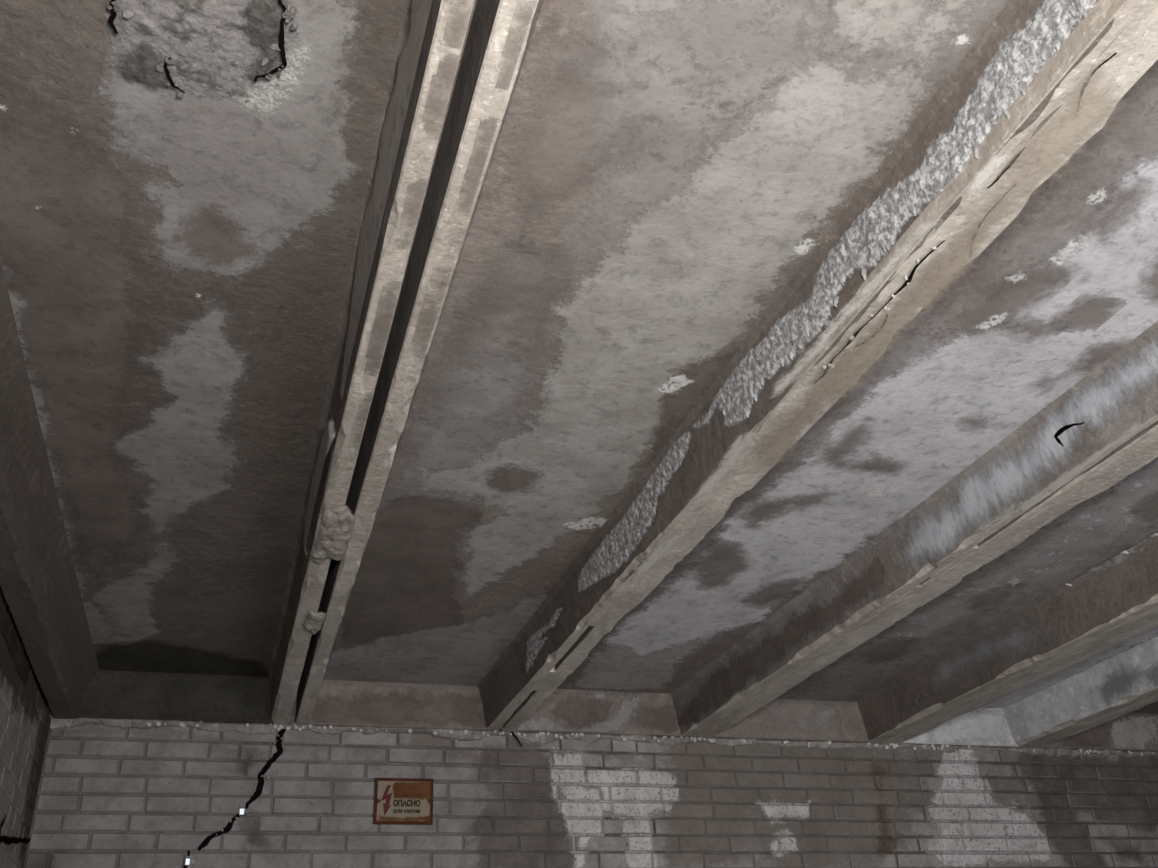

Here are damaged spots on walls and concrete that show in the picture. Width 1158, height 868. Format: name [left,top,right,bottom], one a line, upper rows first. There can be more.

peeling [92,0,361,280]
water stain [0,99,150,577]
water stain [366,291,396,373]
peeling [393,0,1004,598]
water stain [694,431,759,500]
water stain [774,223,935,396]
peeling [569,87,1158,723]
crack [1054,422,1084,446]
crack [0,587,49,706]
crack [184,721,292,868]
water stain [343,496,481,647]
water stain [269,558,949,868]